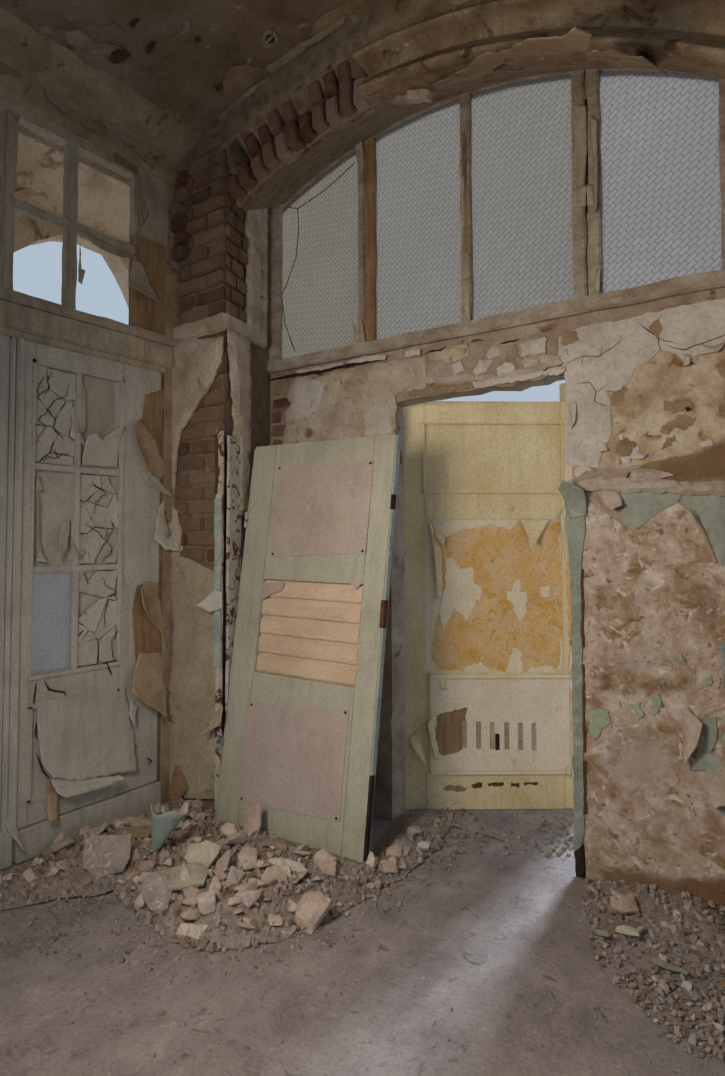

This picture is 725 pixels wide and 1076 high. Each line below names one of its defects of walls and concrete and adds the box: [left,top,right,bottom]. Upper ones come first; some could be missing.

peeling [572,104,598,213]
spalling [272,349,427,445]
crack [568,317,725,407]
flaking render [35,331,226,666]
peeling [510,298,725,879]
peeling [594,925,640,937]